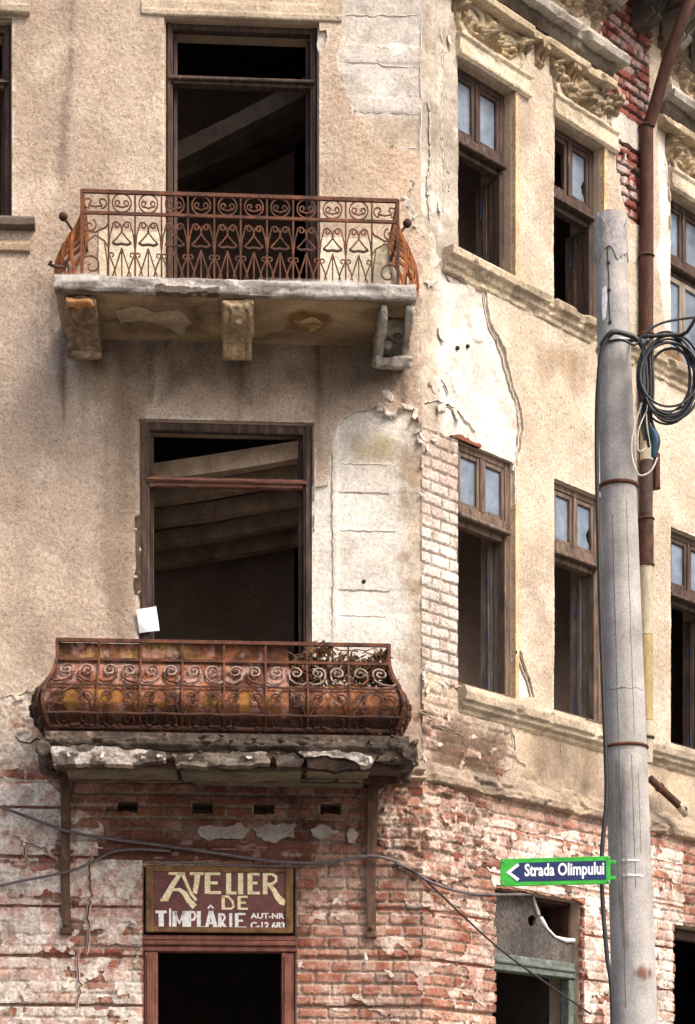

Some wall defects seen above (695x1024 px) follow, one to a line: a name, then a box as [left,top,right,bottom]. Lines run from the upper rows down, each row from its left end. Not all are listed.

flaking render [601,0,652,125]
flaking render [616,140,640,226]
spalling [114,283,220,336]
flaking render [306,0,611,1024]
crack [508,727,526,767]
peeling [0,691,374,1024]
peeling [651,845,685,1024]